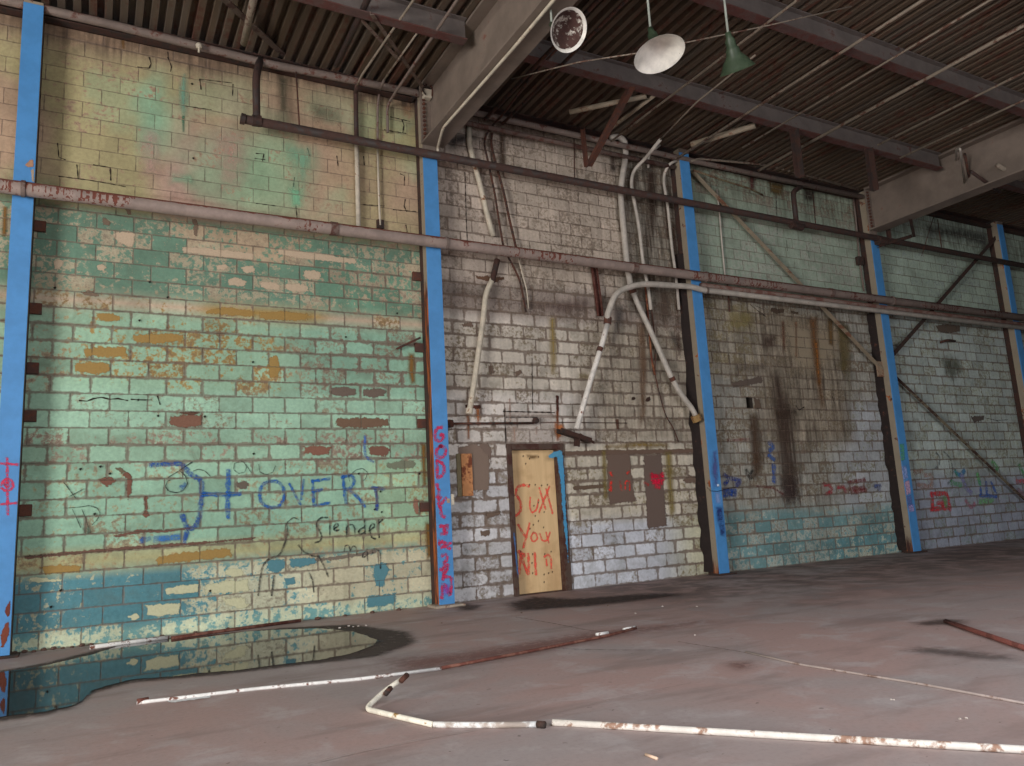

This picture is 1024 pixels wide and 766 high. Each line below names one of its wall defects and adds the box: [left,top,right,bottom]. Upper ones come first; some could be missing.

peeling [102,217,135,247]
peeling [182,219,356,293]
peeling [75,333,184,375]
rust [811,319,833,401]
spalling [169,411,203,428]
spalling [336,417,389,429]
water stain [751,416,761,475]
water stain [774,377,796,498]
spalling [99,467,133,500]
peeling [24,496,256,620]
peeling [267,550,397,608]
peeling [0,601,11,648]